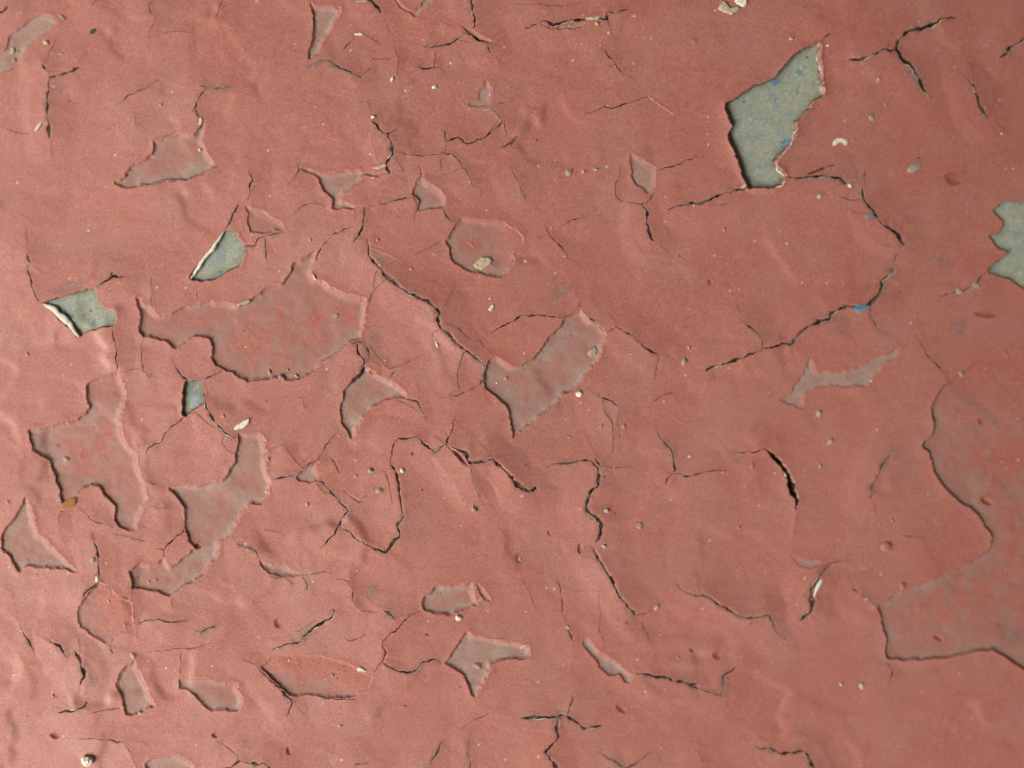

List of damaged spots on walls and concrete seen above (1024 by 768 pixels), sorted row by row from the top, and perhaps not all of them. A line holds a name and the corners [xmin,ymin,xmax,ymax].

peeling [725,43,825,189]
crack [849,17,955,100]
peeling [42,288,117,337]
peeling [190,206,284,281]
peeling [136,250,367,382]
crack [706,165,904,377]
peeling [988,200,1024,289]
peeling [28,372,148,531]
peeling [77,419,272,644]
peeling [182,380,205,417]
crack [238,197,673,716]
peeling [877,346,1024,669]